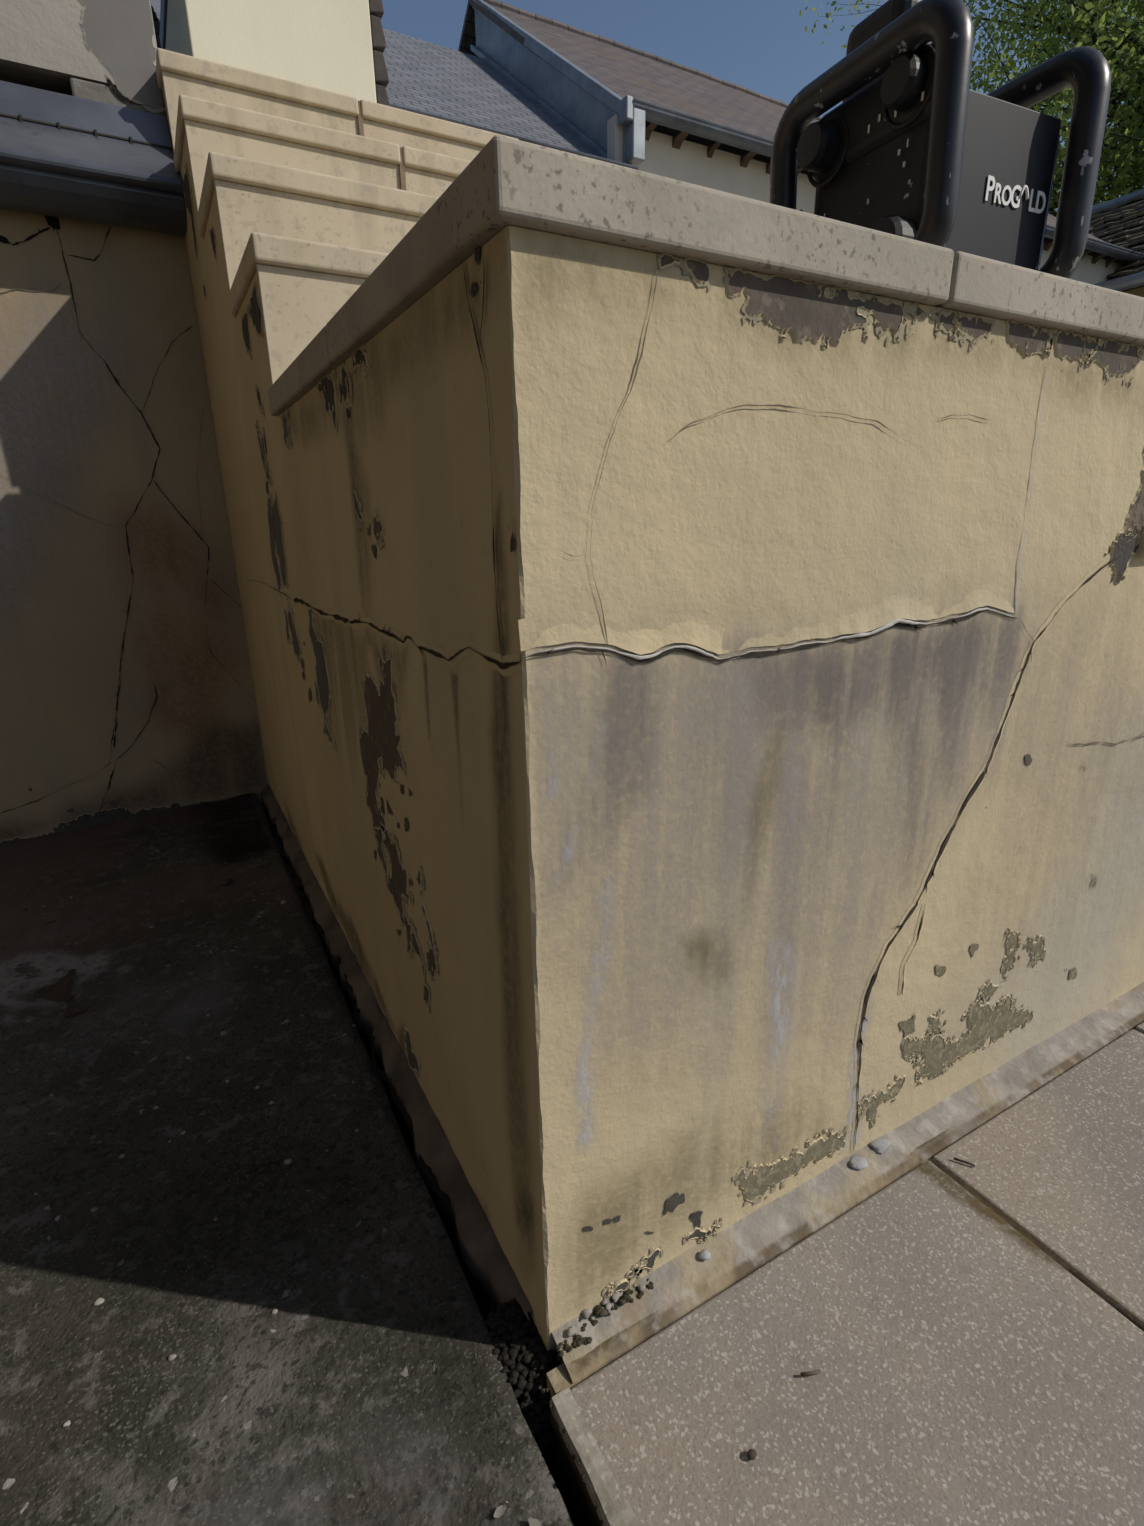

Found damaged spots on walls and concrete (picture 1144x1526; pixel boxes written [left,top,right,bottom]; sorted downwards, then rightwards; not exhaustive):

peeling [241,283,264,360]
crack [0,217,522,813]
peeling [255,384,337,753]
crack [554,263,659,644]
crack [665,404,906,443]
peeling [657,253,1144,388]
spalling [1105,448,1144,585]
peeling [359,649,439,1013]
water stain [547,626,1016,928]
crack [850,367,1122,1153]
peeling [732,927,1047,1207]